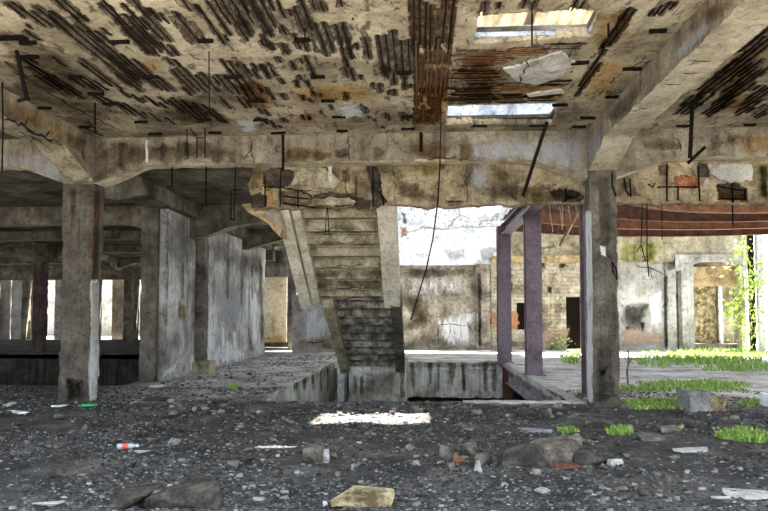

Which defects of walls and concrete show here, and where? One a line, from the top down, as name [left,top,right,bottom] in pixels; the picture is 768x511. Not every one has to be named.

spalling [2,0,638,130]
spalling [671,26,768,120]
crack [5,118,63,146]
peeling [242,166,387,240]
peeling [658,162,753,203]
leakage [409,269,482,346]
leakage [622,262,675,347]
leakage [401,362,465,390]